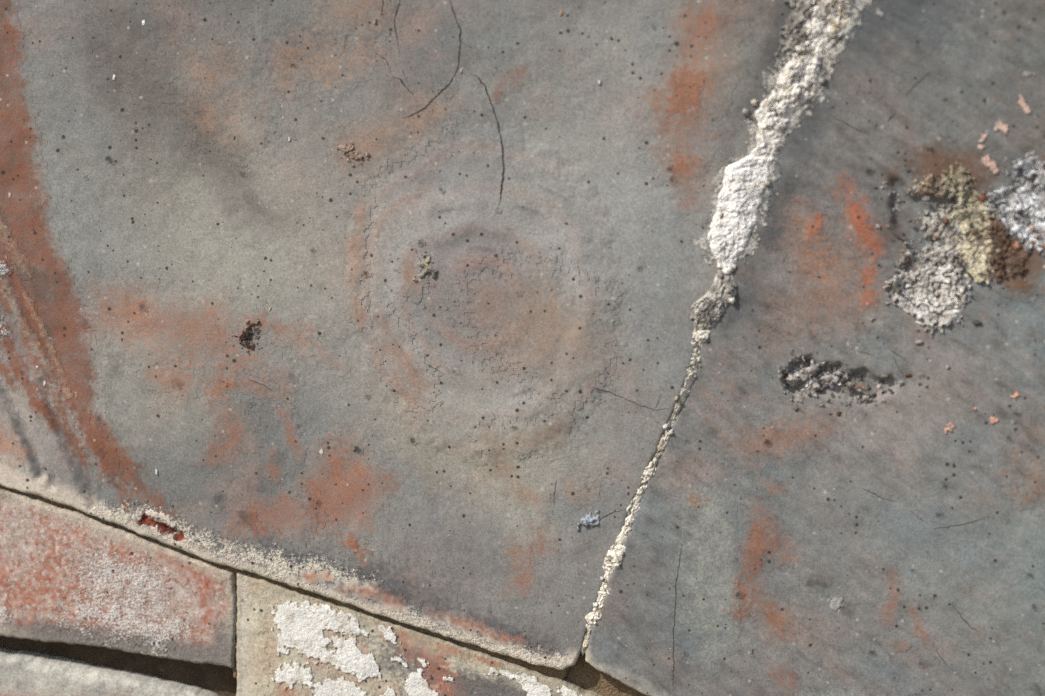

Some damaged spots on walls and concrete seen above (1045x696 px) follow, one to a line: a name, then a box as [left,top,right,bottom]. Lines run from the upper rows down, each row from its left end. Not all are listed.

damp [0,214,74,399]
damp [50,0,313,259]
rust [0,0,416,560]
crack [375,0,504,207]
rust [624,0,761,215]
spalling [770,349,912,416]
spalling [864,121,1045,345]
crack [955,255,974,306]
peeling [1016,95,1032,114]
spalling [135,509,185,541]
damp [0,377,571,696]
peeling [268,599,455,696]